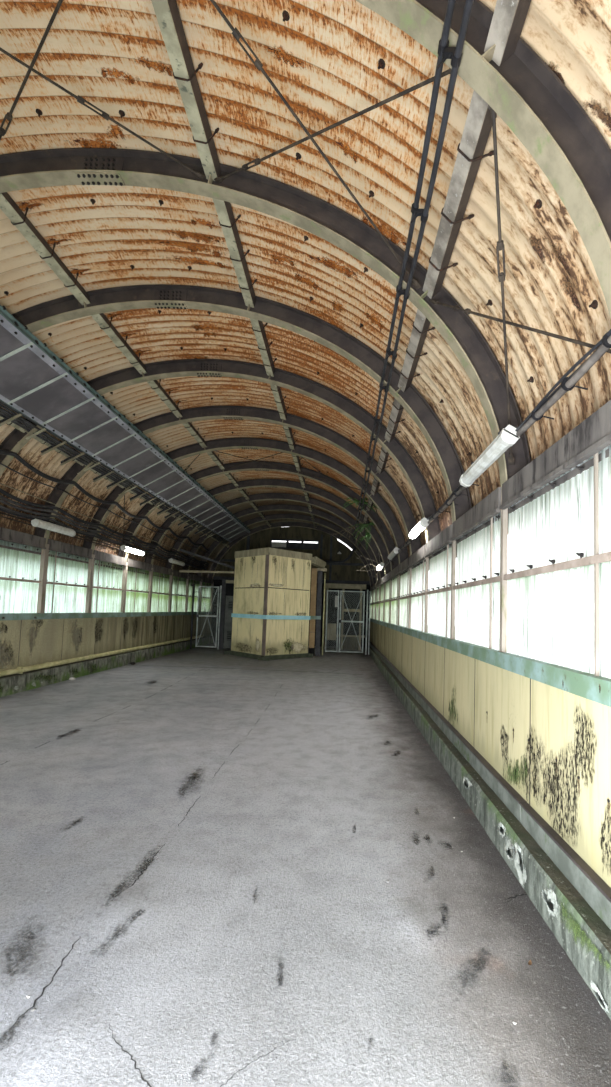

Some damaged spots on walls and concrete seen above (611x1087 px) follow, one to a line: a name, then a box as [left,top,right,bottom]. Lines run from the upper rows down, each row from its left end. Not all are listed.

rust [101,57,173,84]
rust [266,46,306,68]
rust [69,125,125,149]
rust [335,137,362,162]
rust [585,101,611,130]
rust [151,218,226,268]
rust [310,256,361,279]
rust [530,238,581,311]
leakage [501,707,597,844]
leakage [600,805,611,870]
crack [11,939,79,1028]
crack [109,1024,152,1087]